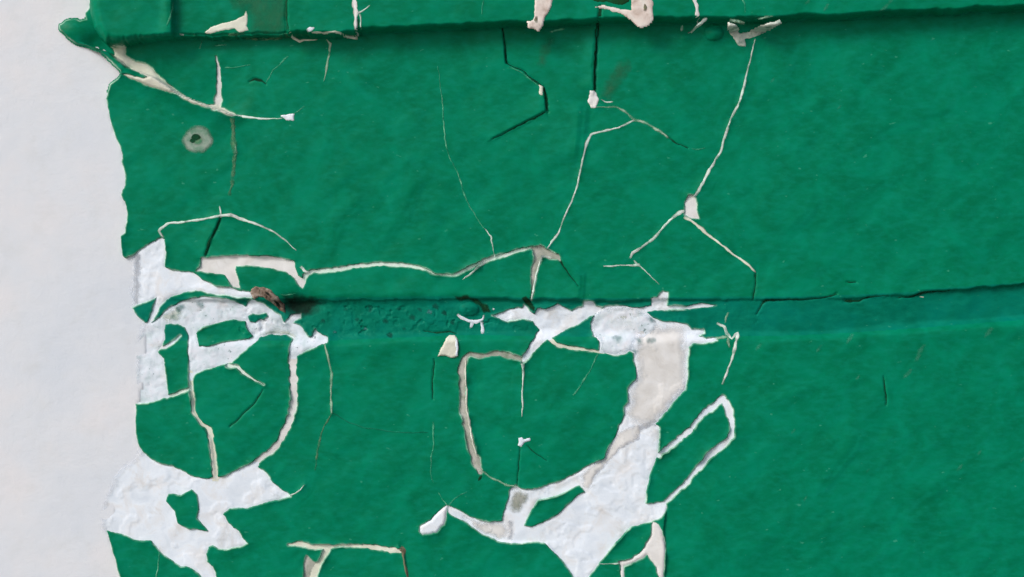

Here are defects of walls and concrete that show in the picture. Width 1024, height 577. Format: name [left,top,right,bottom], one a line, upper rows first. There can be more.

peeling [111,45,302,121]
peeling [205,12,248,34]
peeling [527,0,564,32]
peeling [595,0,653,28]
crack [158,0,949,313]
peeling [132,238,336,426]
peeling [420,245,717,577]
peeling [104,448,303,577]